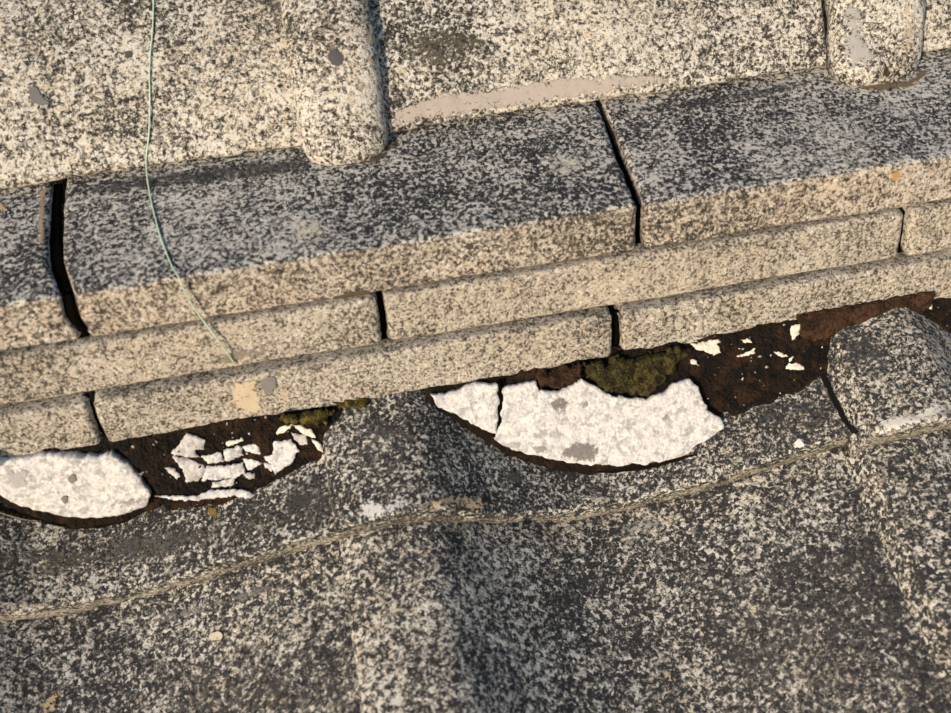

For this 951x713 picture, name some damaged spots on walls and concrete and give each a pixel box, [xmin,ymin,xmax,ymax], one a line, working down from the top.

crack [49,183,90,339]
flaking render [790,324,800,340]
flaking render [690,339,721,365]
flaking render [774,352,804,370]
flaking render [155,424,325,501]